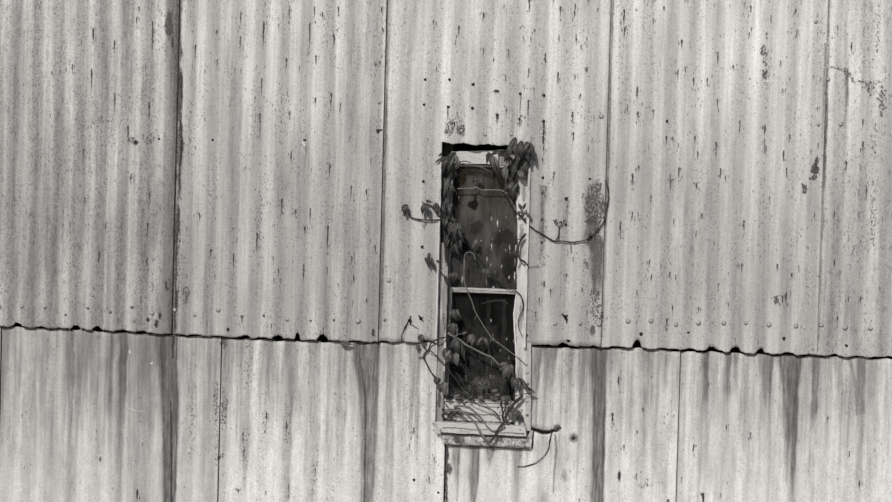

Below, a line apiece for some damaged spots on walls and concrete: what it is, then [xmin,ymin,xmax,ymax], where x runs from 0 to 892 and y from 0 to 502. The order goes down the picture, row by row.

rust [801,49,887,243]
rust [582,179,608,335]
leakage [160,334,178,502]
leakage [592,348,606,502]
leakage [779,355,801,463]